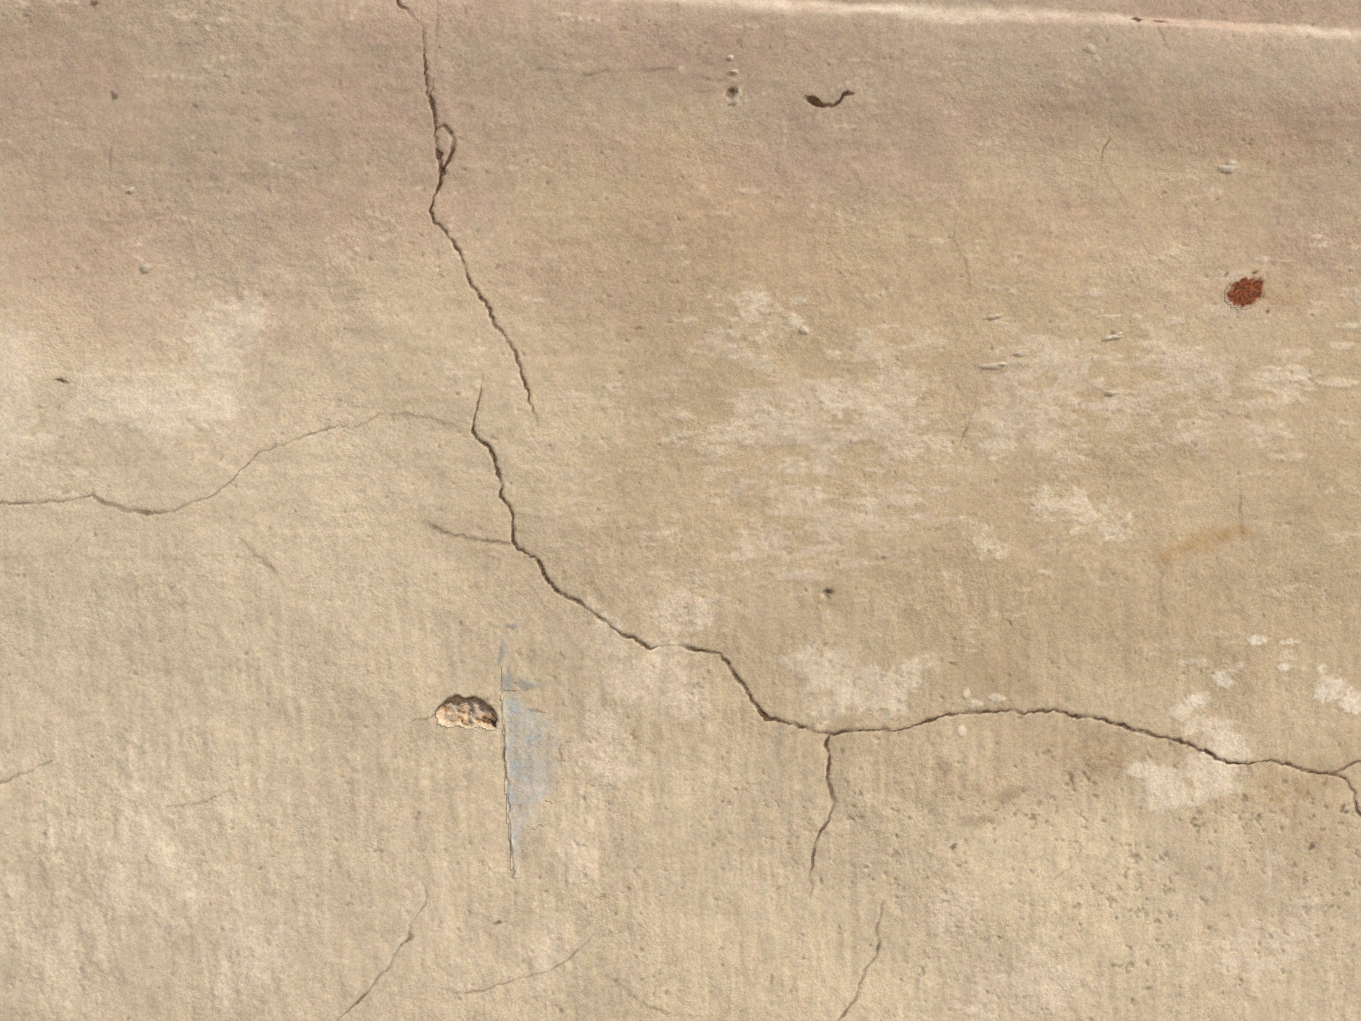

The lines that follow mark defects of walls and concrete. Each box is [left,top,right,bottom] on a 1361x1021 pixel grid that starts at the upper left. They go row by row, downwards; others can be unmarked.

crack [397,0,539,422]
crack [805,90,855,107]
corrosion [1225,270,1271,312]
peeling [436,581,1010,1008]
crack [431,390,1361,885]